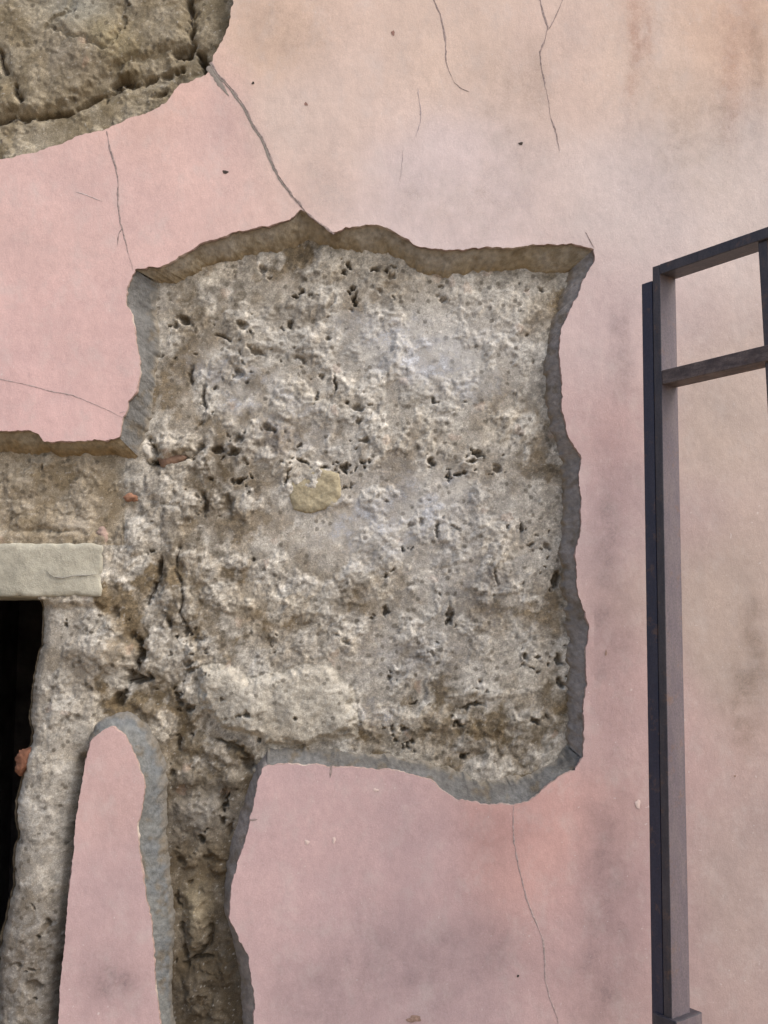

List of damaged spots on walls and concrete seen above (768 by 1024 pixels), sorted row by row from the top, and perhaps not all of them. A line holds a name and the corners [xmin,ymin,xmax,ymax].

crack [77,131,133,269]
flaking render [0,0,233,159]
crack [205,62,334,235]
crack [433,0,469,92]
crack [539,0,563,151]
crack [0,379,126,417]
flaking render [0,212,594,1024]
crack [512,806,559,1021]